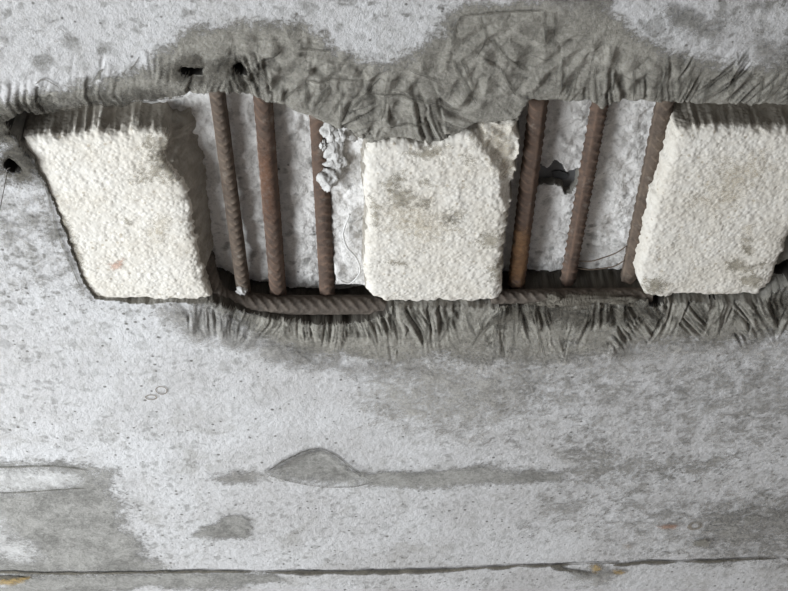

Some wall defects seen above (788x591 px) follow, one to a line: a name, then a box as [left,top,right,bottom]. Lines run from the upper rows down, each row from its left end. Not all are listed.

peeling [0,0,788,143]
peeling [2,146,96,306]
peeling [193,259,788,367]
corrosion [509,229,530,285]
leakage [0,459,286,591]
crack [0,558,788,581]